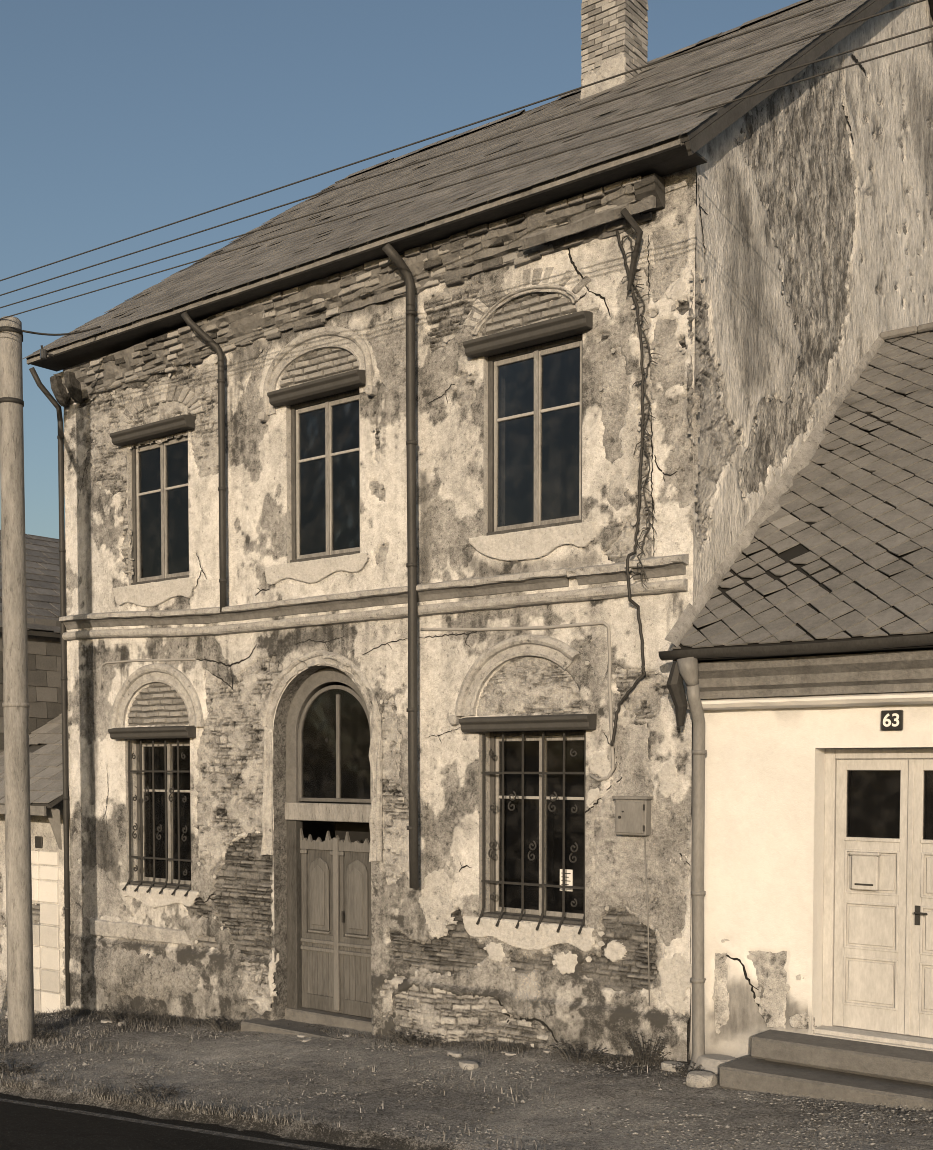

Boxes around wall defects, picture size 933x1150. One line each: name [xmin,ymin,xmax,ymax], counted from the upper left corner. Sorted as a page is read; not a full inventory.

crack [568,248,611,317]
spalling [87,359,219,579]
crack [197,644,257,689]
spalling [182,655,282,1015]
spalling [580,637,692,993]
spalling [0,872,8,1011]
spalling [379,907,558,1048]
spalling [712,939,730,1034]
crack [726,955,760,1006]
spalling [747,950,817,1034]